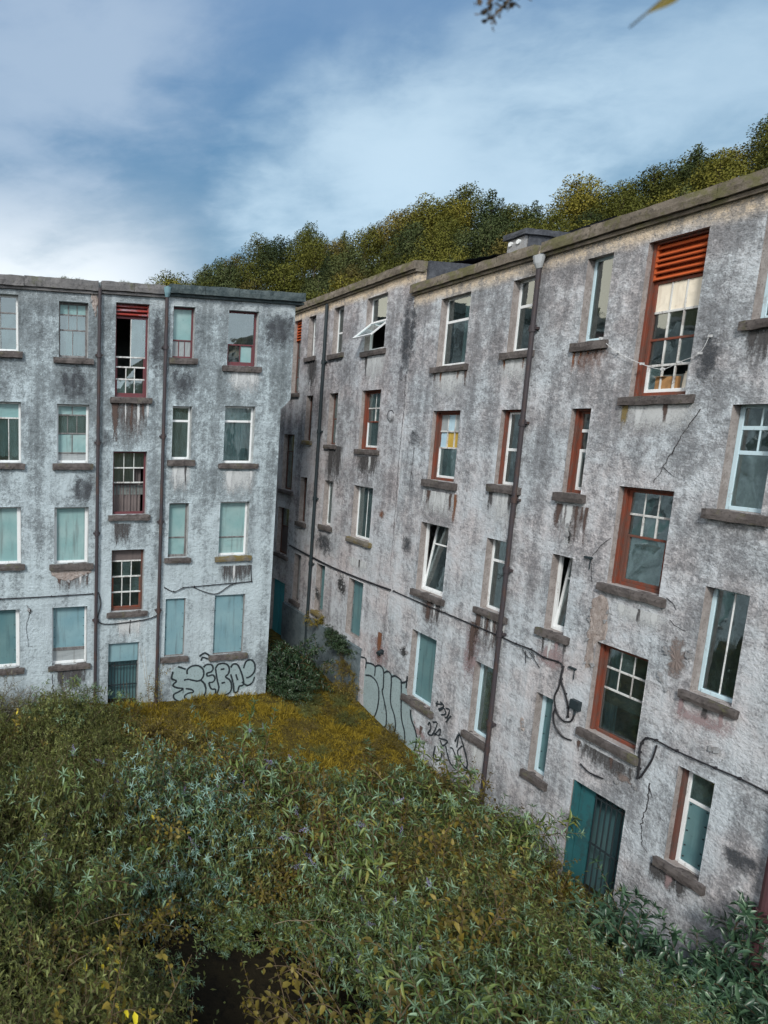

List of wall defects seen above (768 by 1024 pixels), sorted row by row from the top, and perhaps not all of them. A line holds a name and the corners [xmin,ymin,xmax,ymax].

water stain [112,403,149,440]
crack [653,409,701,483]
water stain [221,565,252,582]
crack [640,783,653,852]